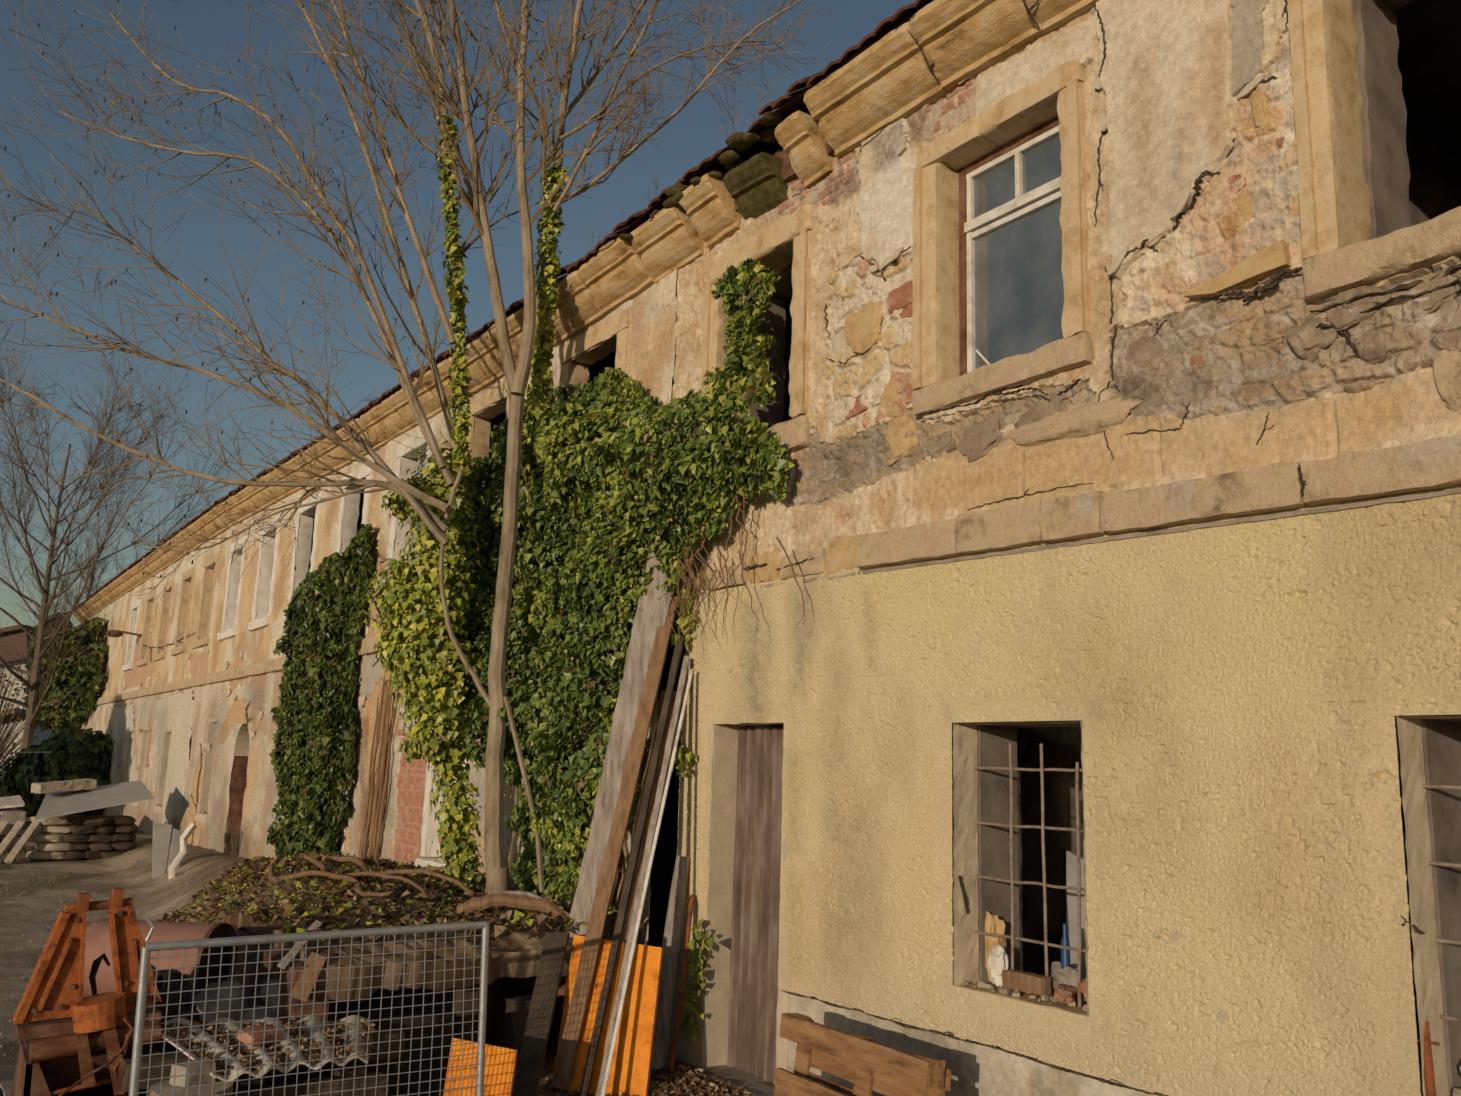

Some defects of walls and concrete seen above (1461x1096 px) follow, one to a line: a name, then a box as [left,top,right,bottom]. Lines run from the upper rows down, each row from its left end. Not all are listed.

crack [907,28,940,84]
crack [1094,4,1107,91]
crack [1236,75,1278,95]
crack [917,130,1235,511]
spalling [757,0,1461,506]
crack [1215,267,1301,303]
crack [1309,263,1461,354]